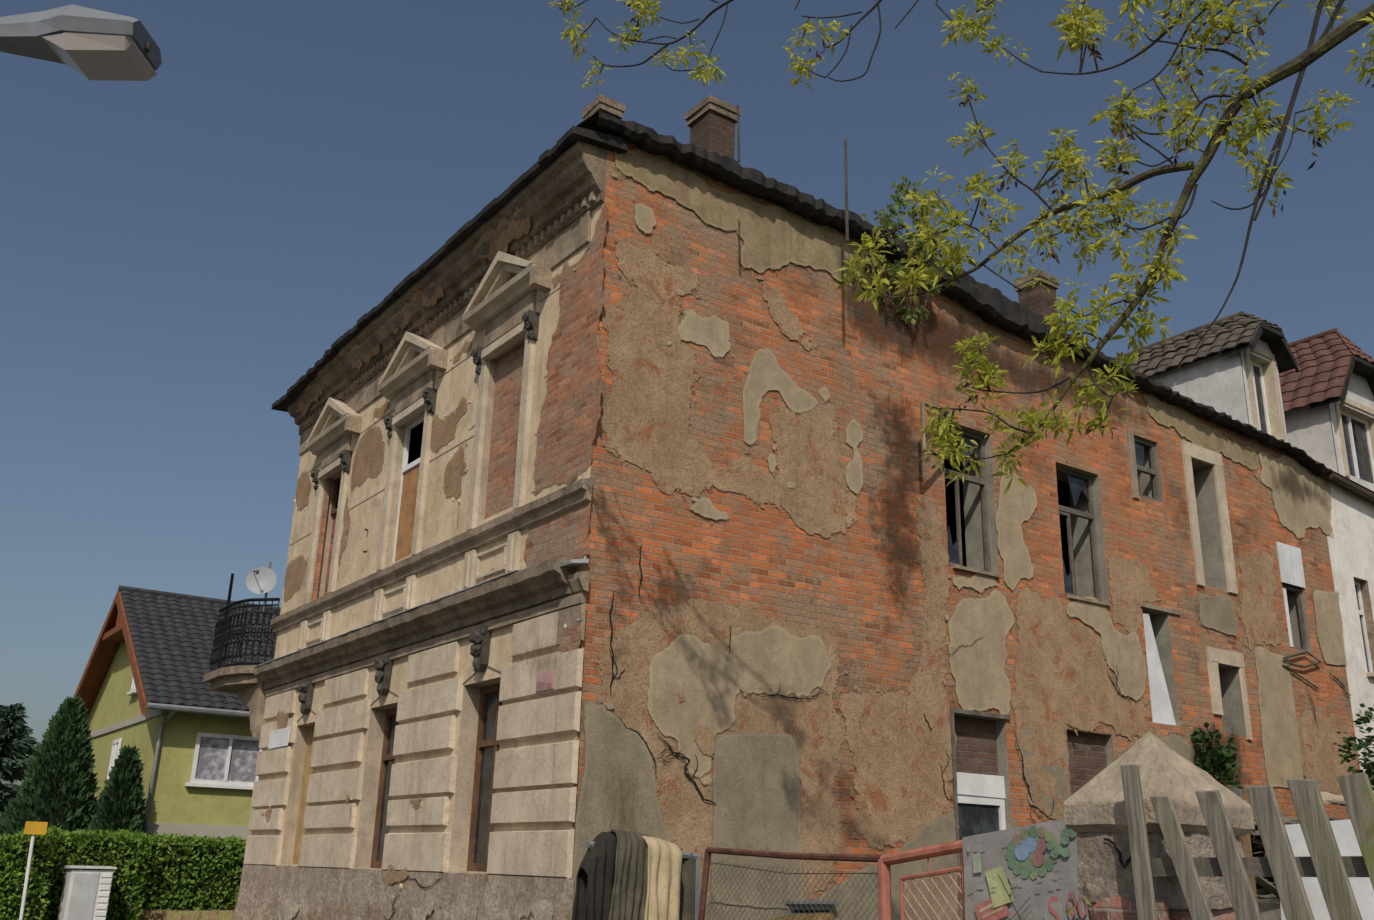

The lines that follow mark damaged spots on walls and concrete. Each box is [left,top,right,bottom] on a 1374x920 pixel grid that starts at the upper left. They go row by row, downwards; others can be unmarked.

spalling [532,148,881,538]
water stain [843,260,1079,396]
spalling [293,471,311,511]
spalling [338,400,390,577]
spalling [430,397,471,512]
spalling [524,494,592,567]
crack [609,544,727,817]
spalling [572,466,1207,920]
crack [1013,729,1057,823]
peeling [1197,550,1357,795]